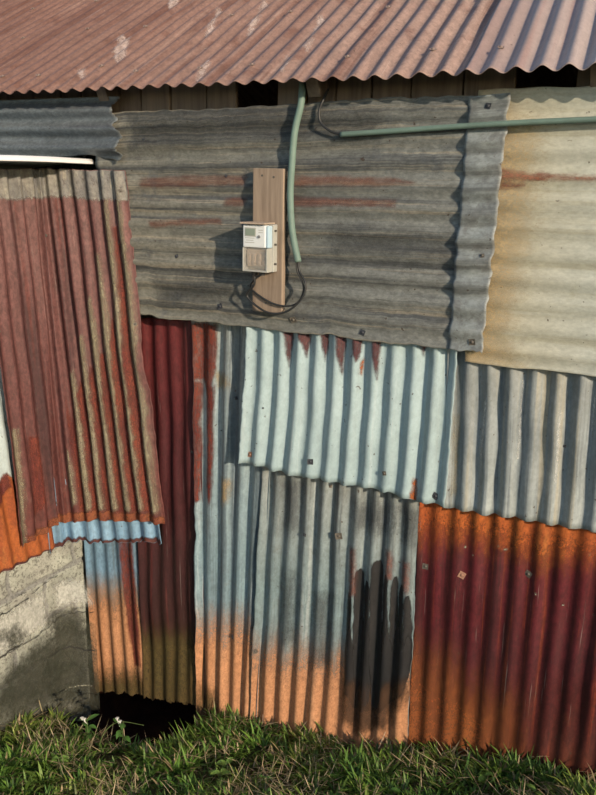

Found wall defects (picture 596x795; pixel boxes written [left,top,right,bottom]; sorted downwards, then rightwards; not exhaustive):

rust [283,332,311,360]
rust [321,334,381,373]
rust [0,227,165,666]
rust [191,322,223,502]
rust [410,479,596,561]
leakage [0,582,217,735]
rust [408,649,513,759]